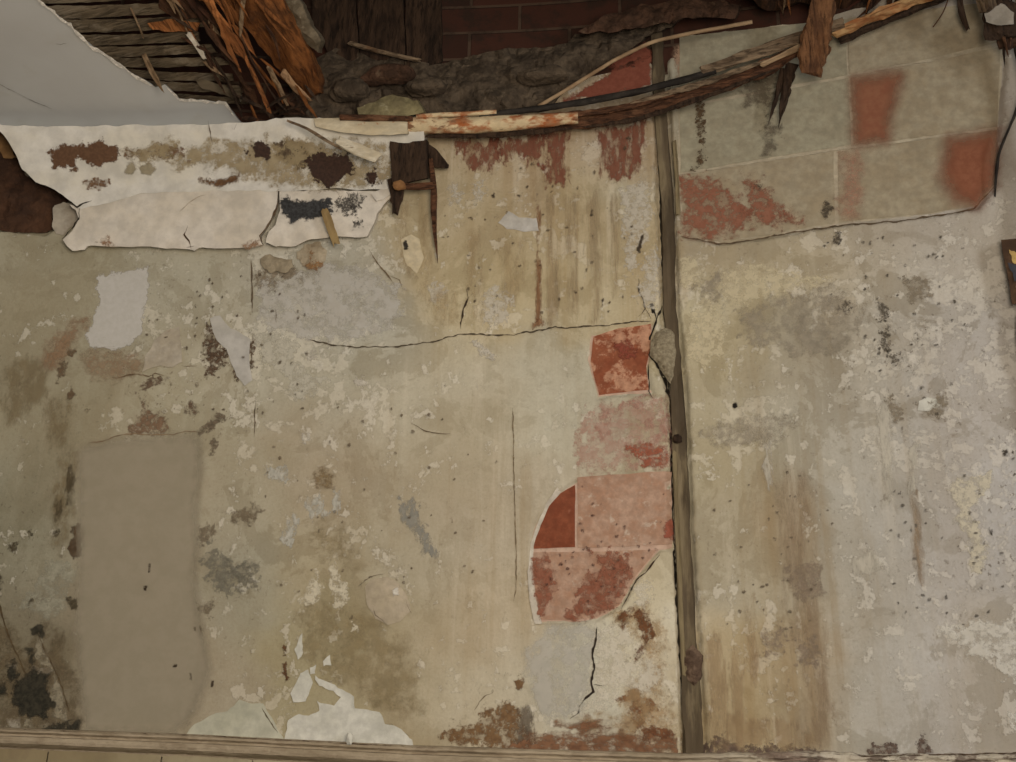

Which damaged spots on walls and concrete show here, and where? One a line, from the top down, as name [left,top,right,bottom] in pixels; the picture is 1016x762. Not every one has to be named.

peeling [195,79,242,102]
spalling [0,152,70,233]
peeling [85,266,149,351]
crack [308,167,994,686]
flaking render [77,438,413,745]
flaking render [530,441,674,715]
water stain [0,625,83,730]
peeling [35,639,68,721]
crack [571,628,602,718]
rust [509,607,681,753]